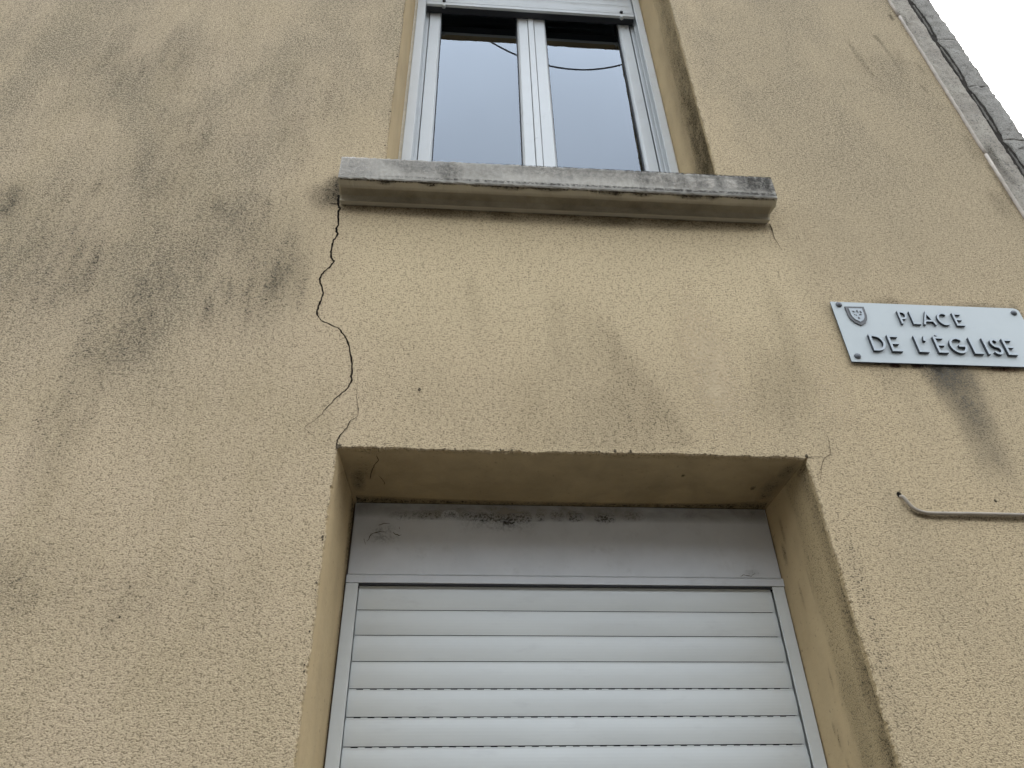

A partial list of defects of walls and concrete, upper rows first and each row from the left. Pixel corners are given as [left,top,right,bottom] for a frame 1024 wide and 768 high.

crack [304,195,359,445]
damp [345,497,643,575]